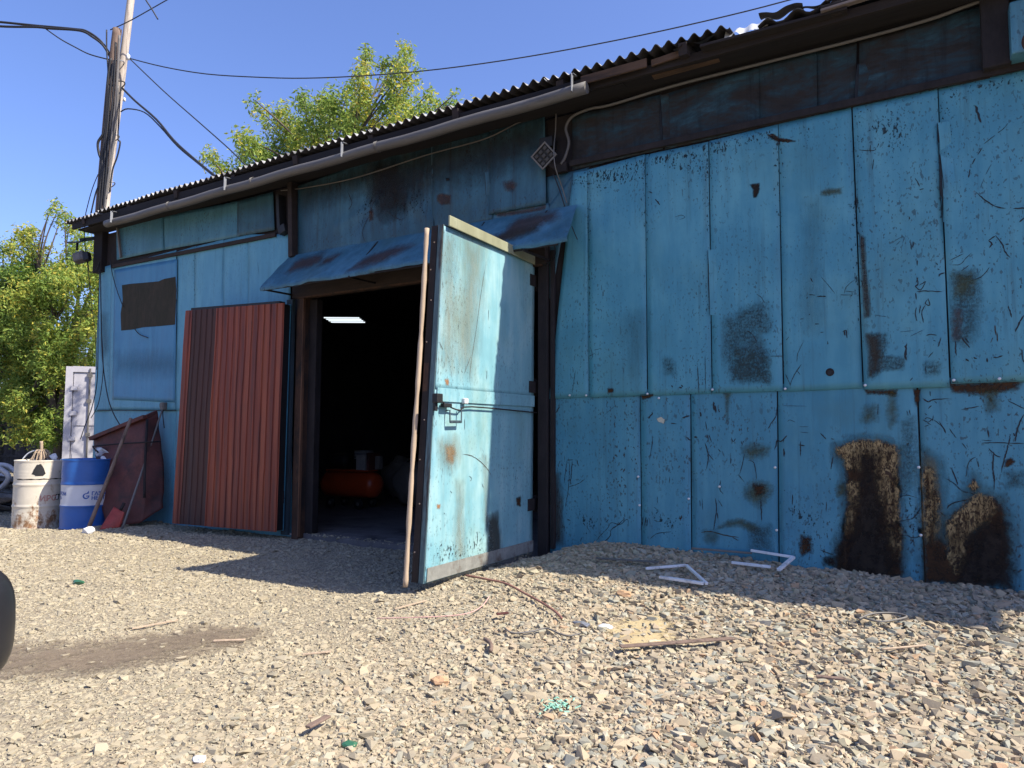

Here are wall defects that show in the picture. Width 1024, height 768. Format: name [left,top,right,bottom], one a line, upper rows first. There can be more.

corrosion [748,484,768,501]
corrosion [800,535,813,555]
corrosion [823,439,903,577]
corrosion [921,458,1014,589]